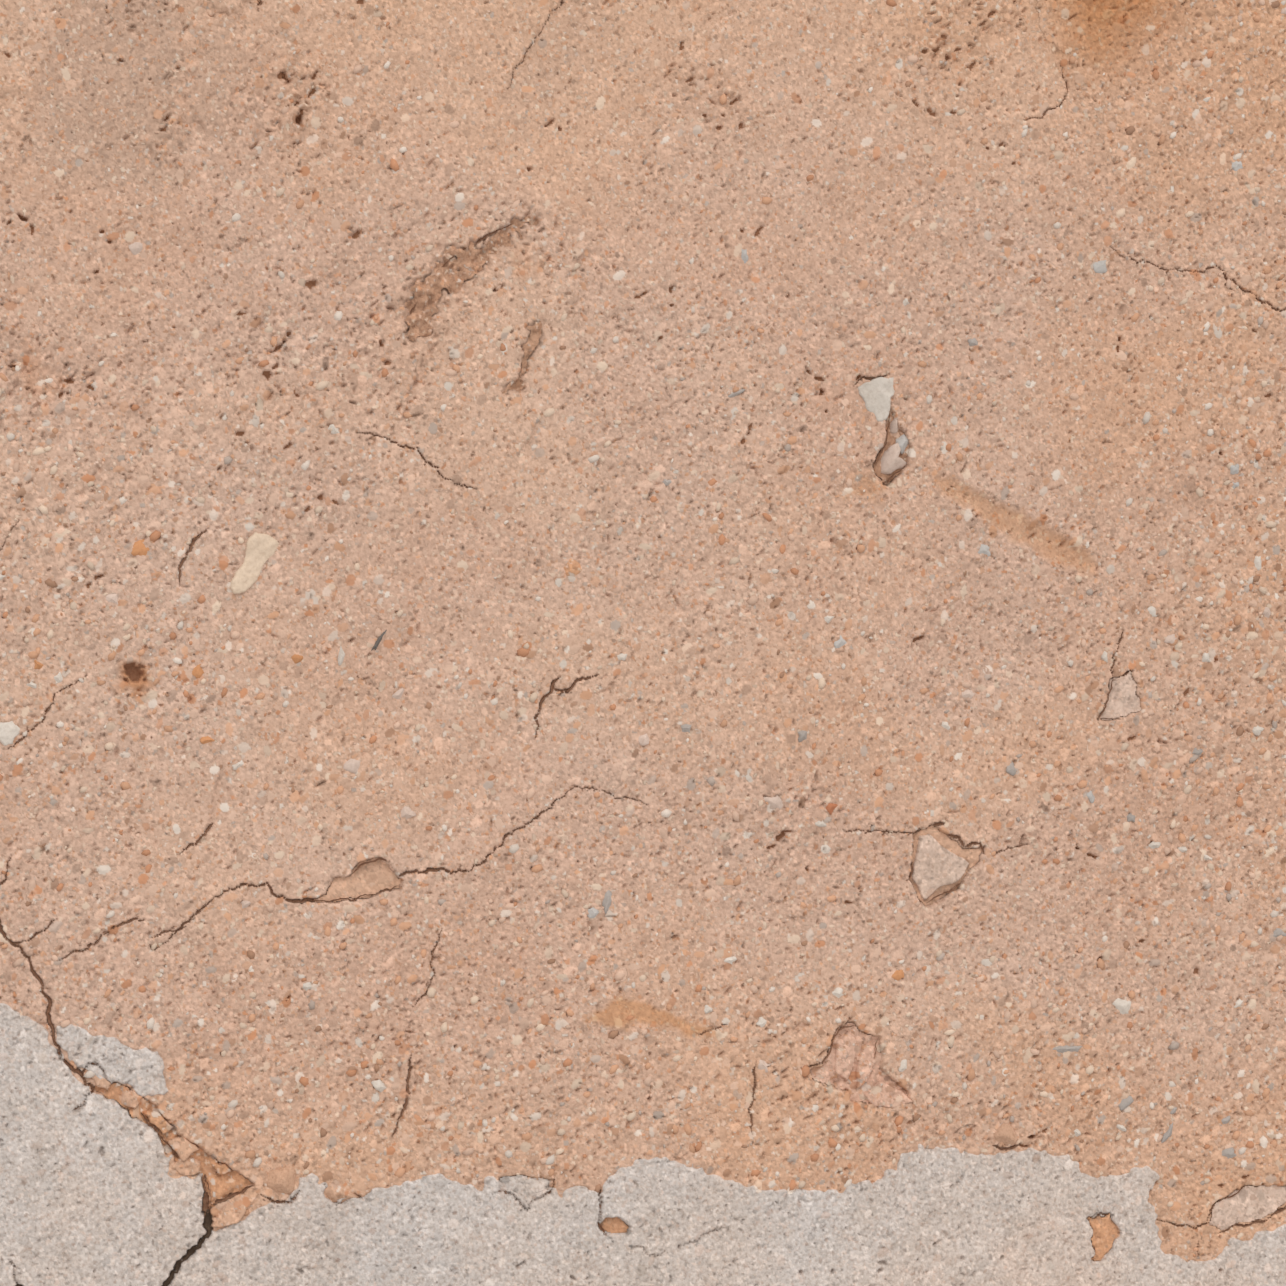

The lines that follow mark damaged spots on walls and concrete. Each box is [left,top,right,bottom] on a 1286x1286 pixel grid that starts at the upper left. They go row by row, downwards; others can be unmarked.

spalling [855,374,909,485]
crack [535,674,599,738]
crack [179,824,212,855]
crack [399,786,643,876]
spalling [905,823,984,906]
crack [0,883,314,1110]
crack [393,1060,412,1135]
spalling [81,1063,253,1213]
crack [163,1209,212,1286]
spalling [598,1189,628,1236]
peeling [1087,1212,1119,1261]
spalling [1164,1175,1286,1255]